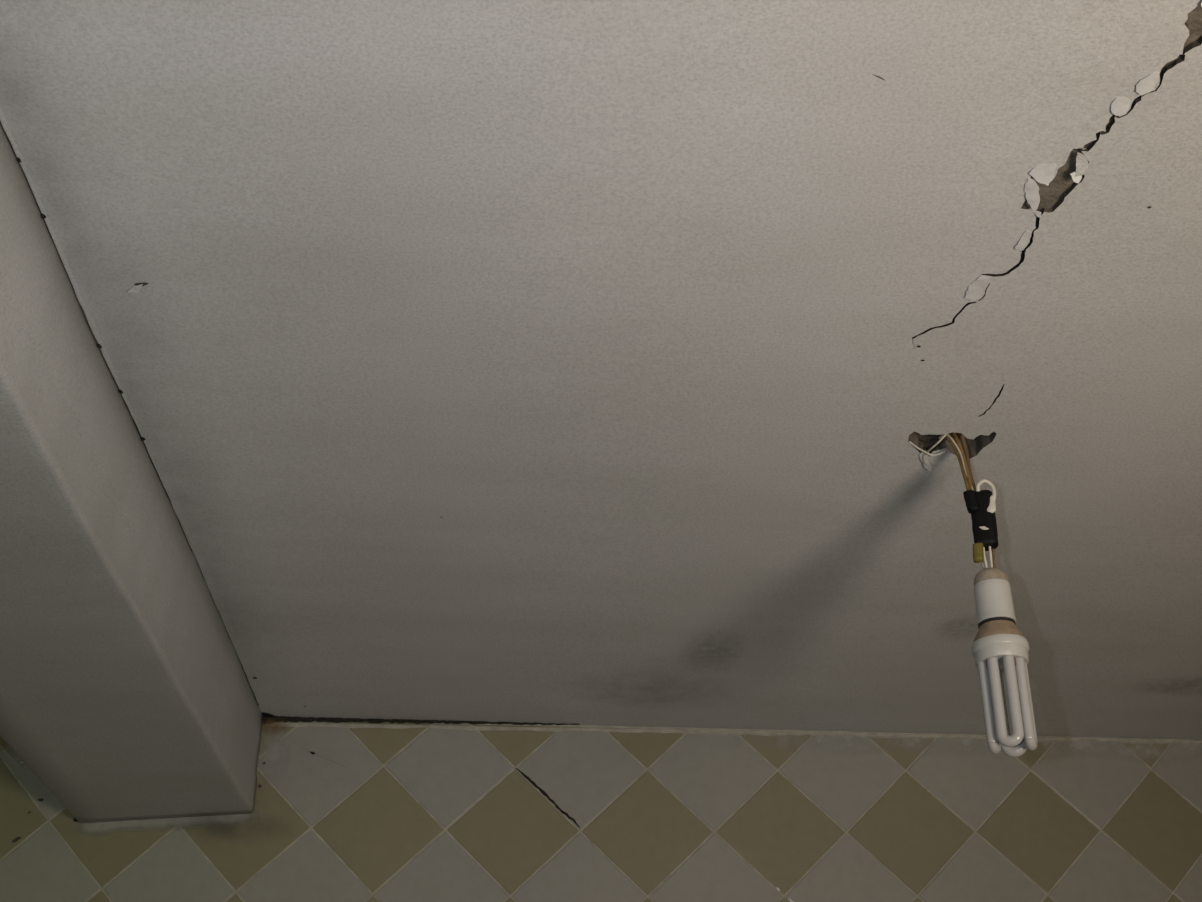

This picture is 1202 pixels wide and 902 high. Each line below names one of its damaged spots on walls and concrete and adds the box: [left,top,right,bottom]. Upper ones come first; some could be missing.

spalling [1184,2,1202,53]
crack [1081,50,1185,152]
spalling [1021,148,1089,217]
crack [912,217,1040,361]
crack [979,384,1005,416]
crack [515,768,580,828]